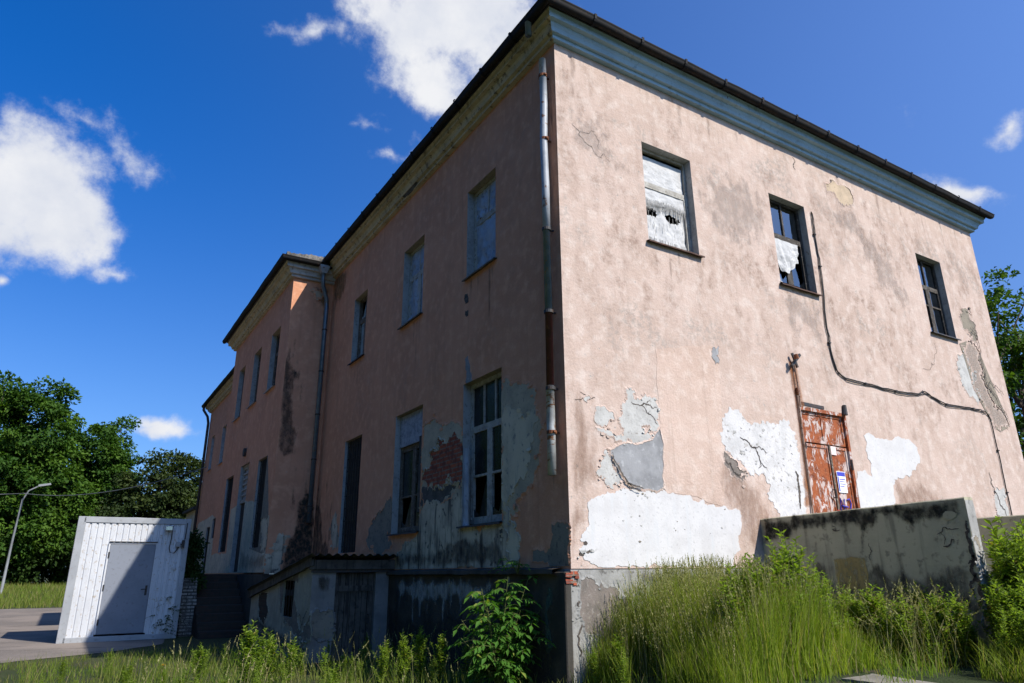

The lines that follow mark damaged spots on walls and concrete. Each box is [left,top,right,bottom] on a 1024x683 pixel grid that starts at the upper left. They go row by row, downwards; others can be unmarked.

leakage [280,361,296,455]
flaking render [419,414,464,516]
flaking render [501,375,544,519]
peeling [575,385,661,501]
peeling [722,428,765,488]
flaking render [956,306,1010,433]
leakage [284,489,328,568]
leakage [765,503,956,541]